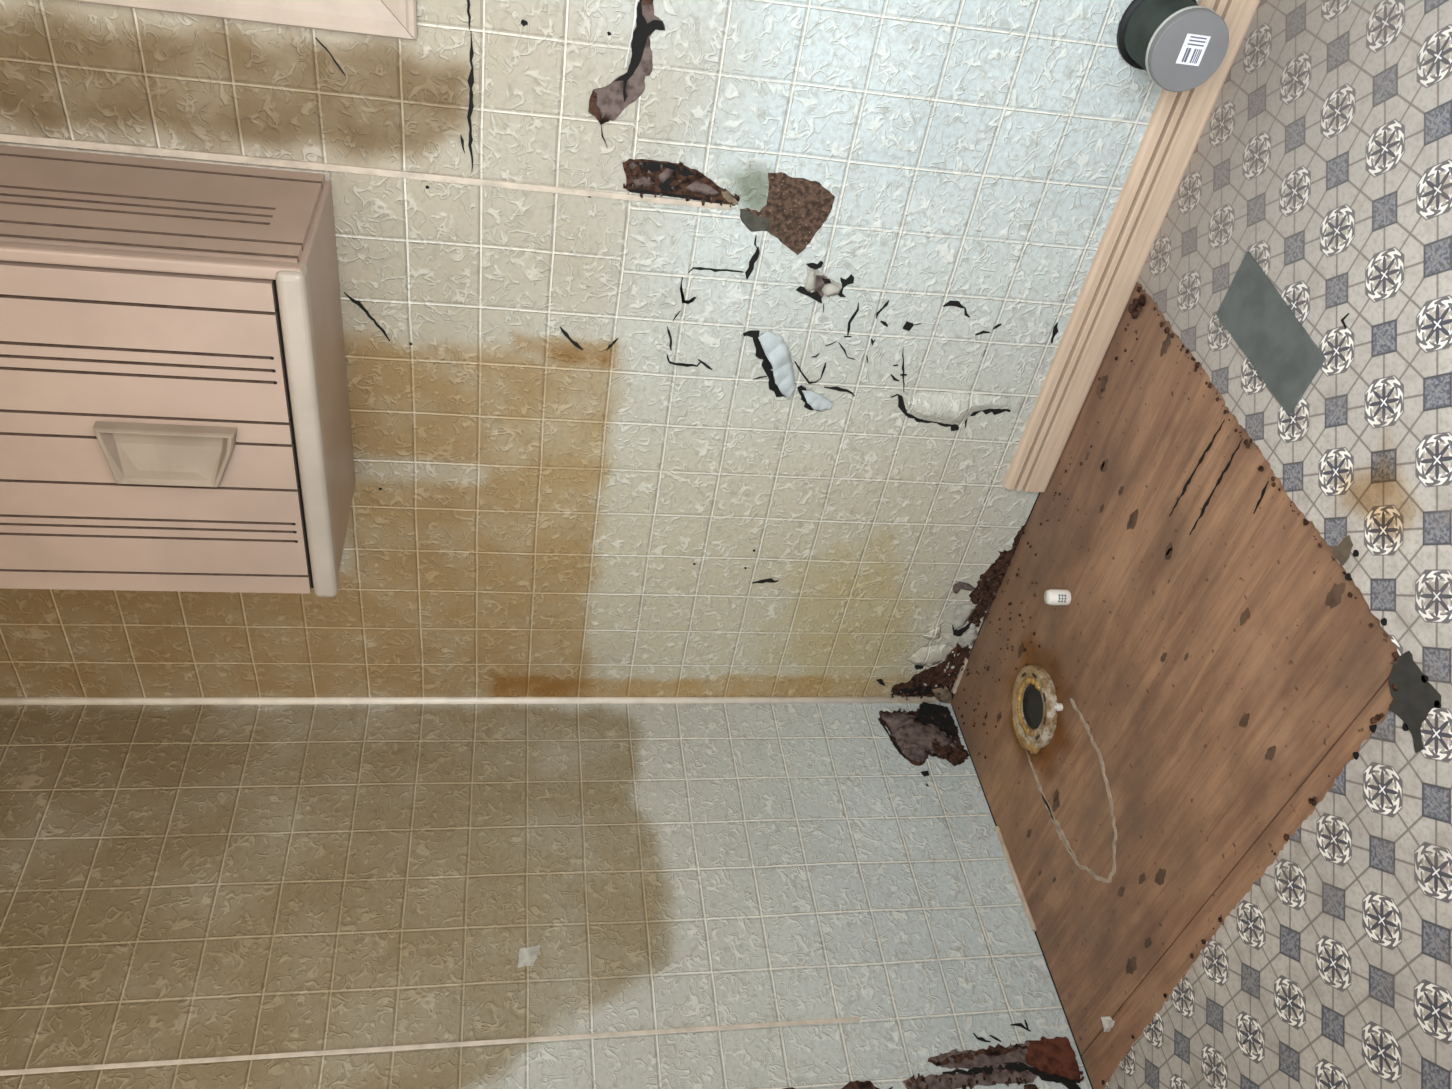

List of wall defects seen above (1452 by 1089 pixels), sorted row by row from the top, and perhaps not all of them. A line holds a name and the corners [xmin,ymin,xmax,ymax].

crack [460,0,474,170]
spalling [588,91,609,125]
spalling [622,158,854,313]
peeling [743,330,833,412]
spalling [876,604,978,739]
spalling [841,1080,893,1089]